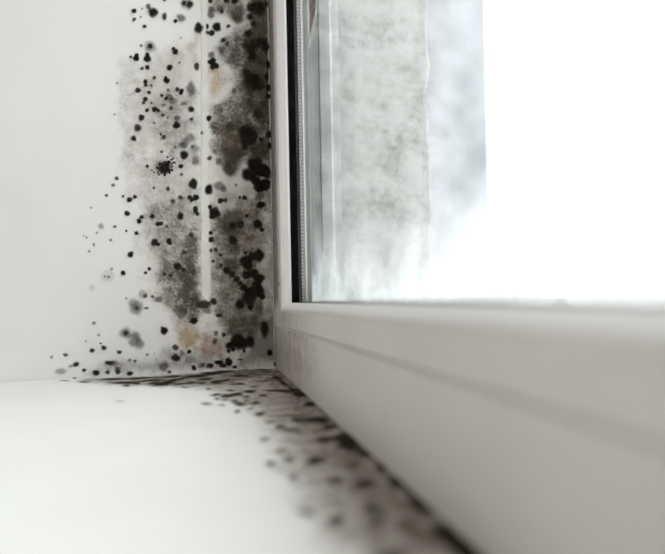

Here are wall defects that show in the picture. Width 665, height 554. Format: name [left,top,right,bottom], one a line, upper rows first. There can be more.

leakage [73,0,473,554]